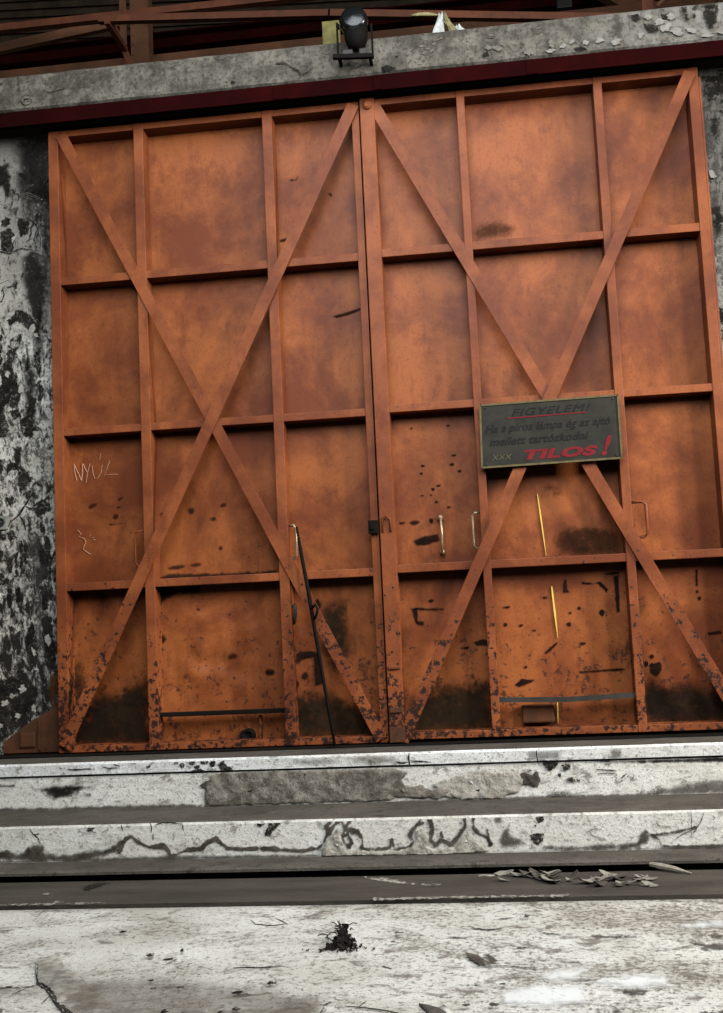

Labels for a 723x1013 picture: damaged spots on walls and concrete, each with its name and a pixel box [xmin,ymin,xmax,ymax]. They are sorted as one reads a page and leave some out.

peeling [7,307,40,340]
peeling [0,335,40,440]
peeling [0,448,32,506]
peeling [0,499,52,609]
rust [160,563,277,603]
rust [412,599,443,626]
rust [582,572,620,612]
peeling [0,585,56,740]
rust [296,651,322,687]
spalling [174,761,580,807]
crack [150,822,184,839]
crack [0,951,331,1013]